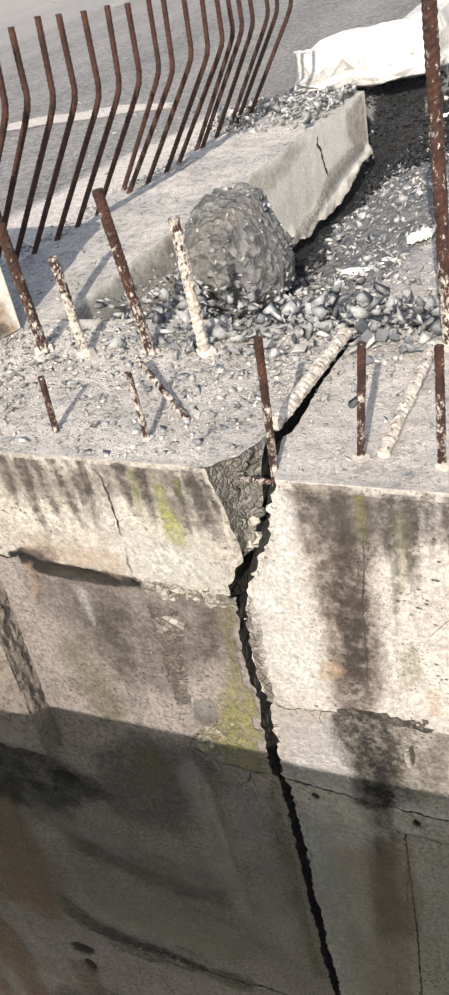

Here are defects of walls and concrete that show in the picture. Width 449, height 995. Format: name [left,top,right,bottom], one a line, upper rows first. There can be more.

water stain [0,456,57,525]
water stain [48,459,93,512]
crack [94,469,132,573]
water stain [103,463,217,527]
crack [191,339,449,995]
water stain [253,484,449,814]
water stain [0,742,251,914]
water stain [59,894,208,972]
crack [88,928,285,995]